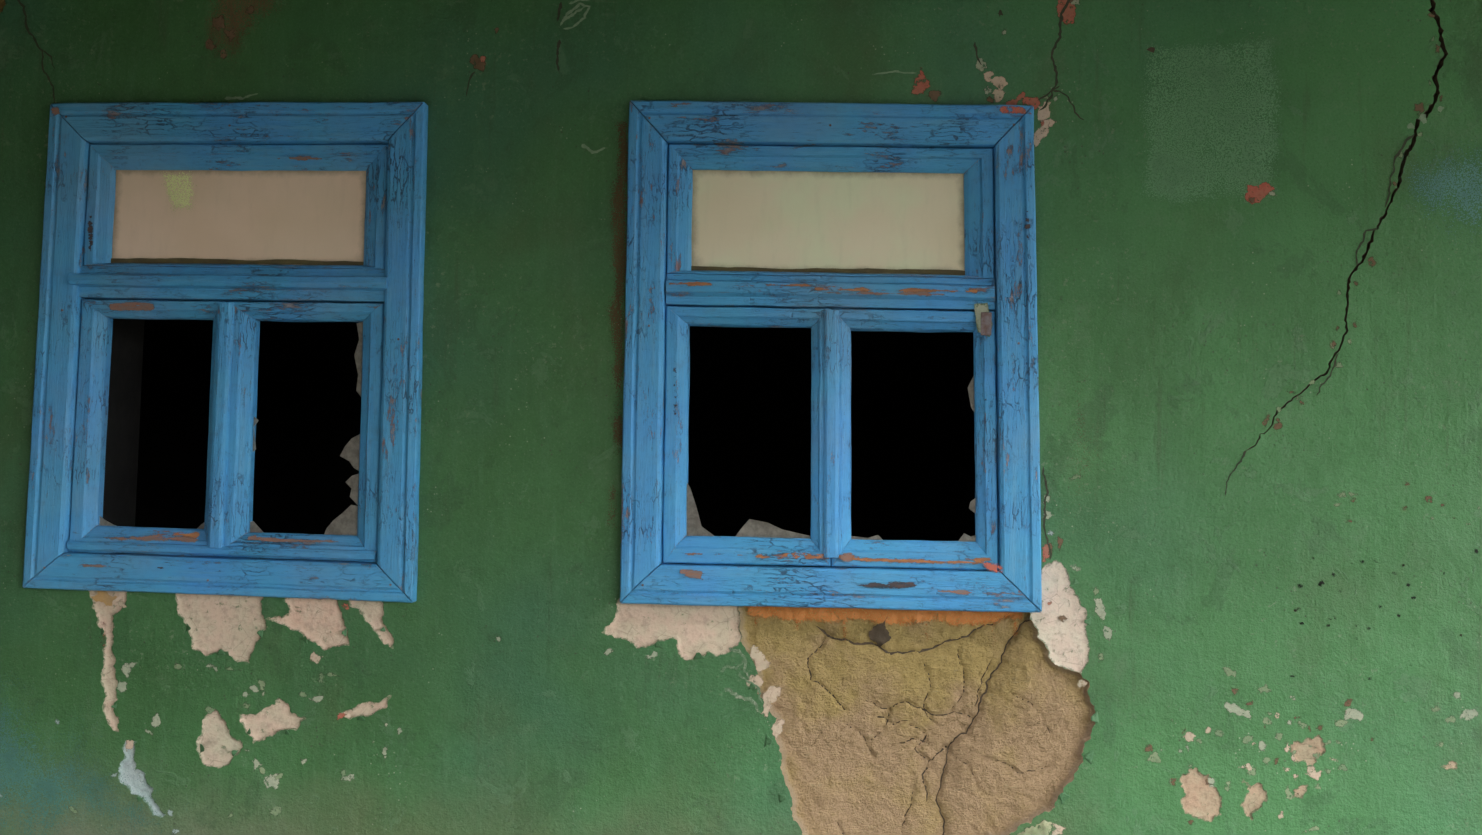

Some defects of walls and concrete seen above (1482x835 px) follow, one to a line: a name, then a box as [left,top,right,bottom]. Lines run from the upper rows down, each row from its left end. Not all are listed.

spalling [973,43,1059,147]
spalling [1245,182,1277,205]
crack [1225,0,1448,495]
peeling [88,590,179,833]
peeling [175,593,403,816]
spalling [601,467,1113,835]
spalling [1145,666,1364,825]
spalling [1434,743,1458,770]
spalling [1430,691,1478,724]